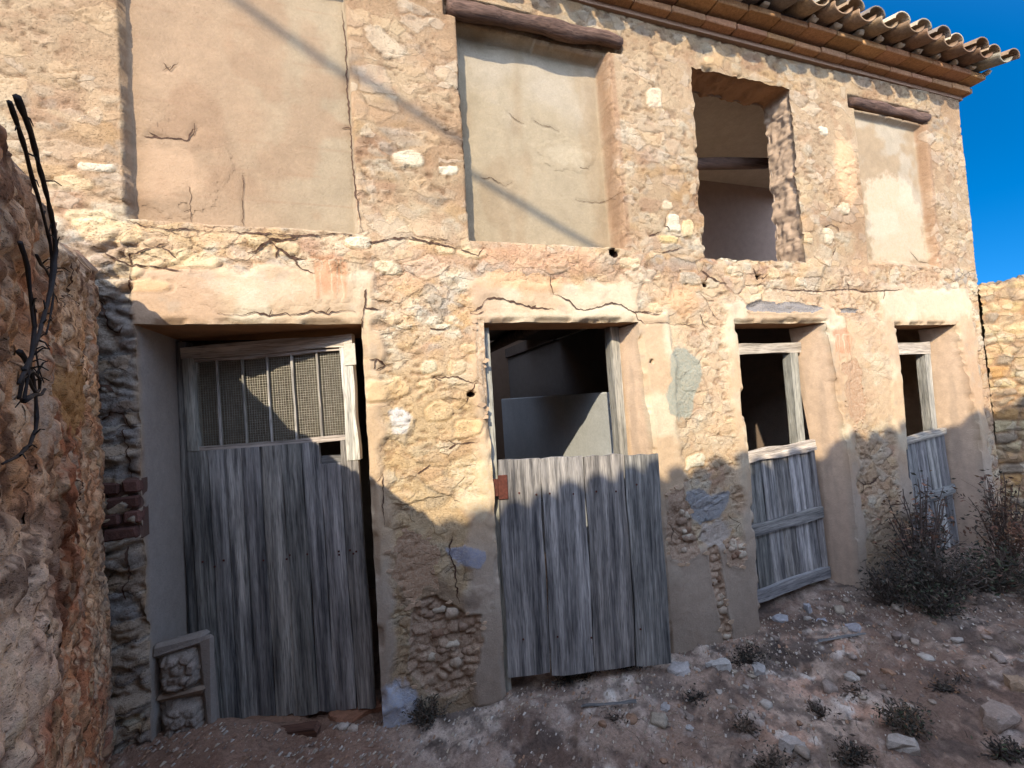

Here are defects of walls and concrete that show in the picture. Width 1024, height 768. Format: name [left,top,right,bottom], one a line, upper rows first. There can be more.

crack [105,16,483,299]
crack [471,271,725,329]
crack [445,536,459,600]
flaking render [662,484,751,644]
flaking render [401,596,487,700]